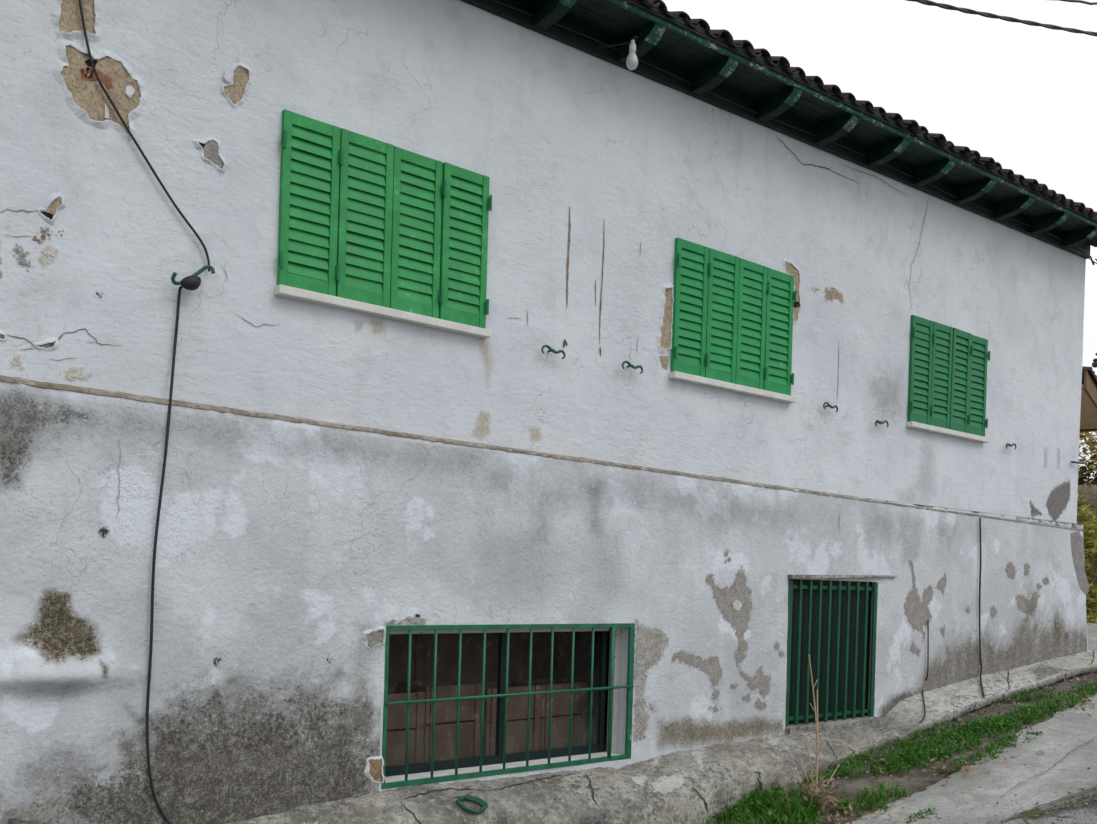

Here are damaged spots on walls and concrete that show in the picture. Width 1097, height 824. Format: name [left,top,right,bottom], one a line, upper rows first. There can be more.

flaking render [50,0,147,142]
flaking render [220,62,252,109]
crack [777,136,930,308]
crack [6,328,122,361]
flaking render [656,283,674,370]
flaking render [782,258,845,325]
water stain [0,388,88,488]
flaking render [19,588,107,678]
peeling [631,549,773,742]
peeling [904,559,948,657]
peeling [1015,575,1050,614]
water stain [36,676,380,824]